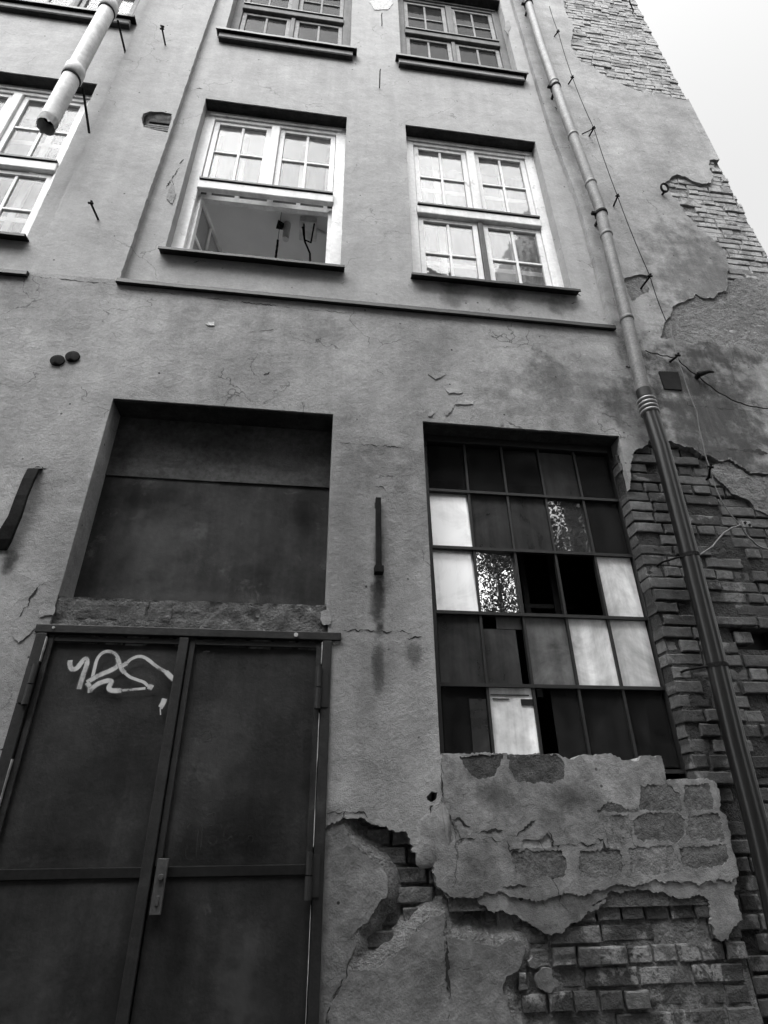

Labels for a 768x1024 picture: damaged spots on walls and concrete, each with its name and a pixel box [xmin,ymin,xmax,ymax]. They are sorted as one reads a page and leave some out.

flaking render [563,0,686,100]
flaking render [660,161,768,357]
flaking render [319,442,768,1024]